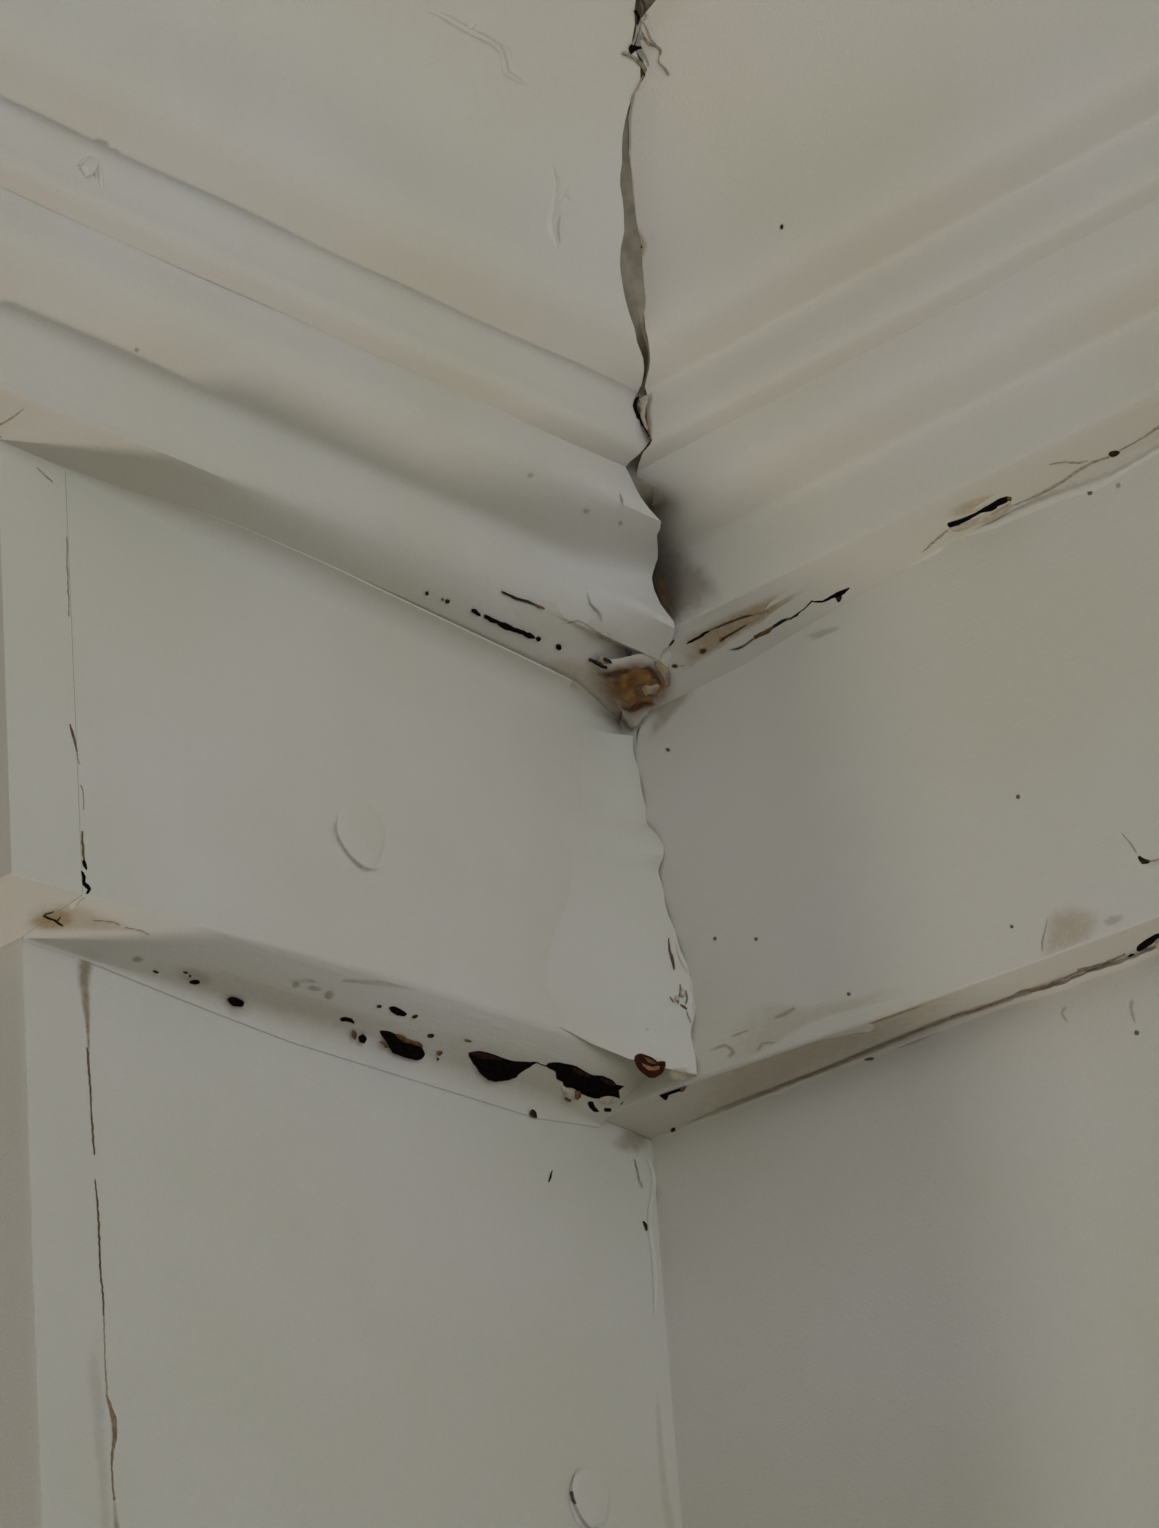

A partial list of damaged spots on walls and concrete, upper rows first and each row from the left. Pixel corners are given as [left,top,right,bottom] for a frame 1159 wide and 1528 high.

crack [620,0,669,510]
spalling [947,496,1012,528]
crack [64,537,72,617]
corrosion [589,606,771,735]
crack [39,724,149,935]
crack [1138,856,1159,868]
peeling [1128,933,1159,957]
spalling [227,997,244,1007]
spalling [340,1006,425,1060]
spalling [468,1051,625,1099]
crack [81,963,118,1528]